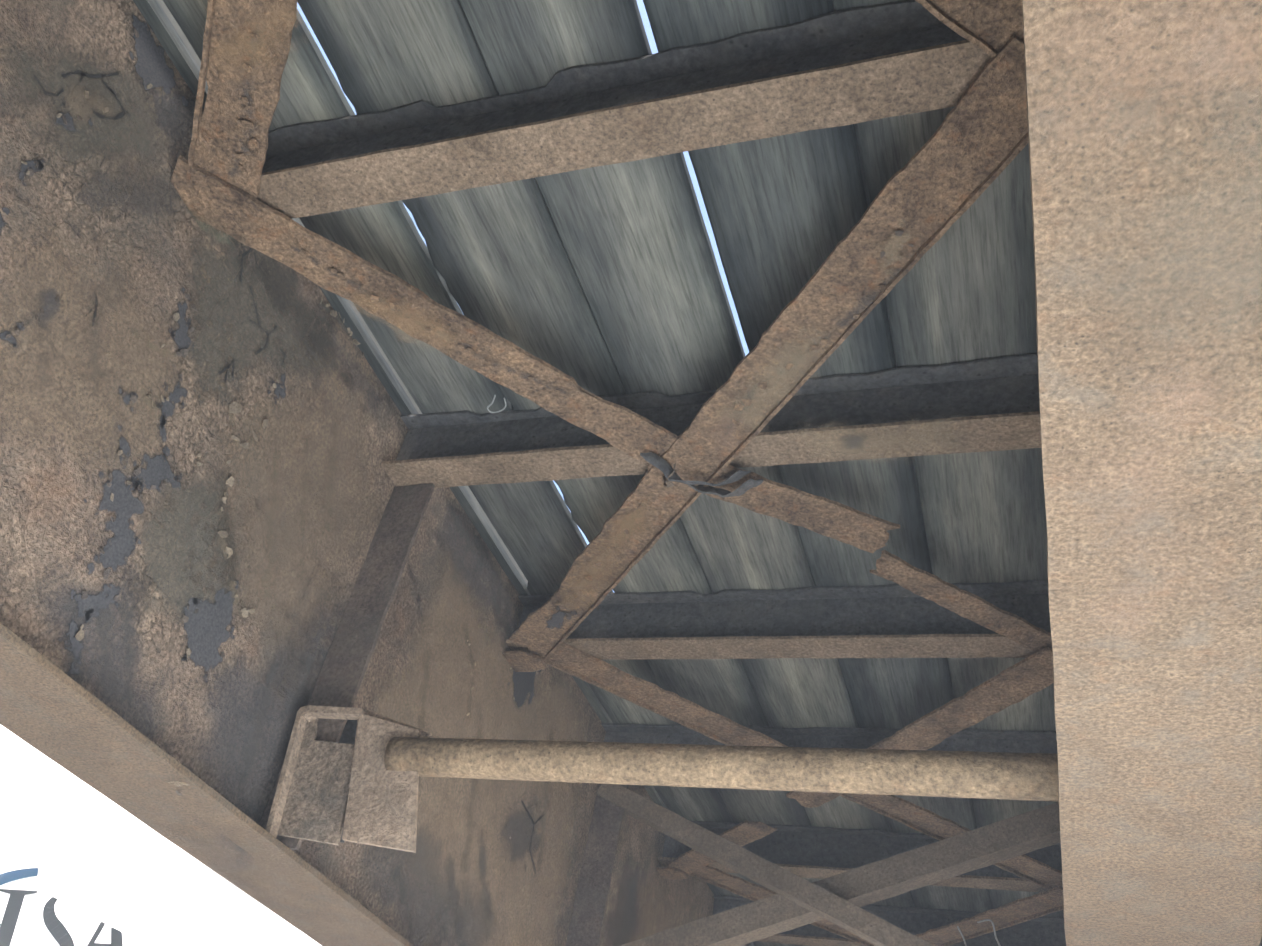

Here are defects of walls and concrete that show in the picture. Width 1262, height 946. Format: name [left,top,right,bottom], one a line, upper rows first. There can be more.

spalling [59,287,198,675]
peeling [221,460,235,511]
spalling [177,581,255,682]